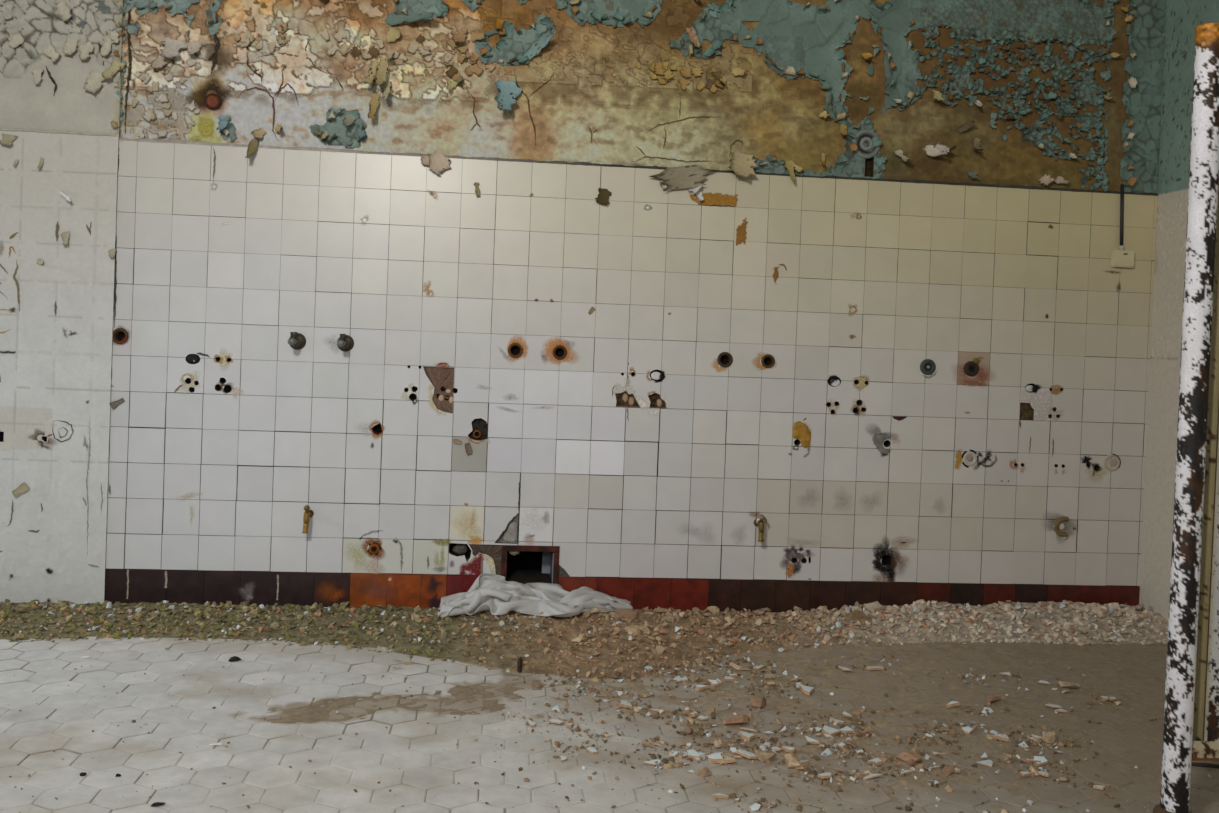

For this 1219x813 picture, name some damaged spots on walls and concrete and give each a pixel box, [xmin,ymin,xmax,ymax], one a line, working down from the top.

crack [41,67,57,96]
peeling [31,0,1138,192]
rust [545,339,574,363]
spalling [412,363,455,414]
spalling [449,481,521,575]